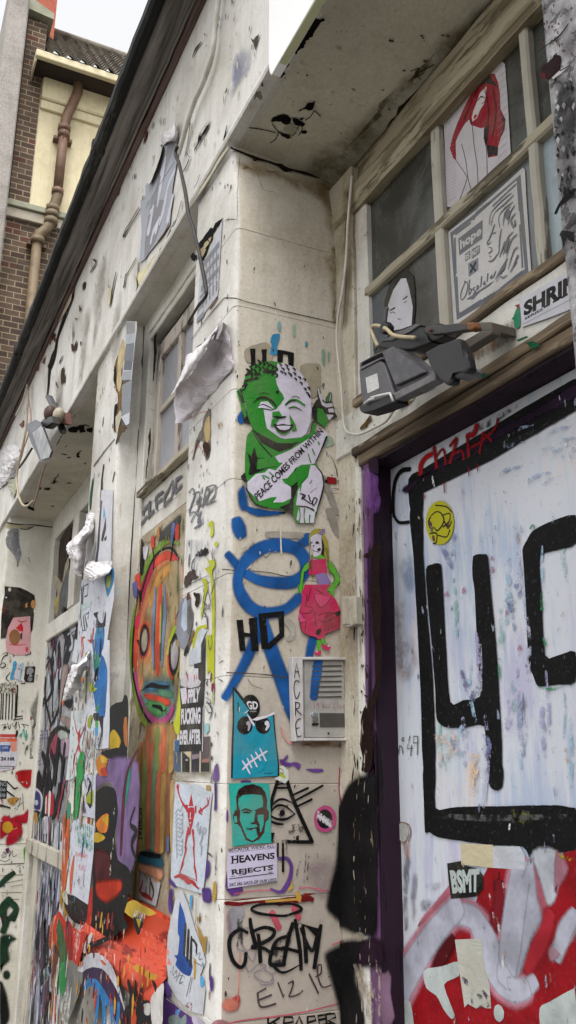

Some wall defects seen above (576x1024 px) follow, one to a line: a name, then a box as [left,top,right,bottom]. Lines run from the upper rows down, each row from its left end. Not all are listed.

peeling [280,18,325,79]
peeling [249,101,320,143]